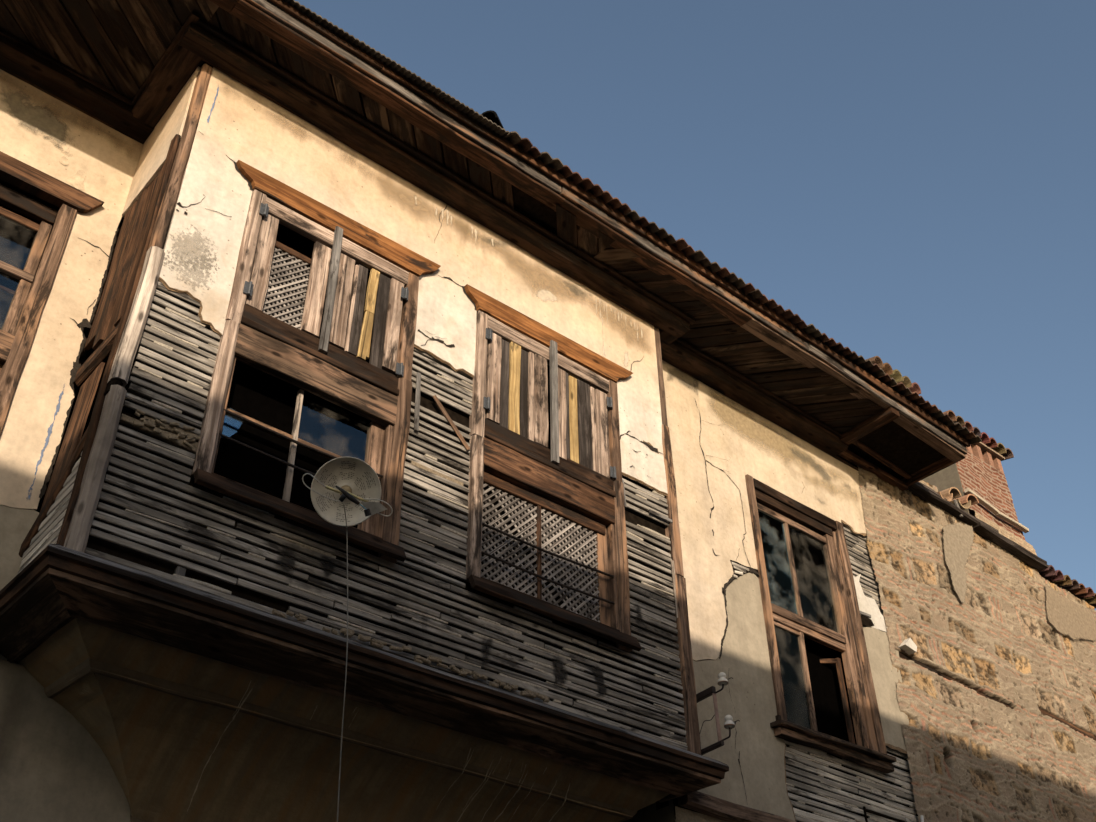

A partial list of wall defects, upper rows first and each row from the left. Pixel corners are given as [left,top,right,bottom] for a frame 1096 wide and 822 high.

damp [3,91,89,146]
crack [226,155,253,190]
crack [176,197,232,217]
crack [418,329,455,347]
crack [620,431,662,477]
spalling [85,277,688,750]
spalling [728,560,759,584]
crack [695,400,759,799]